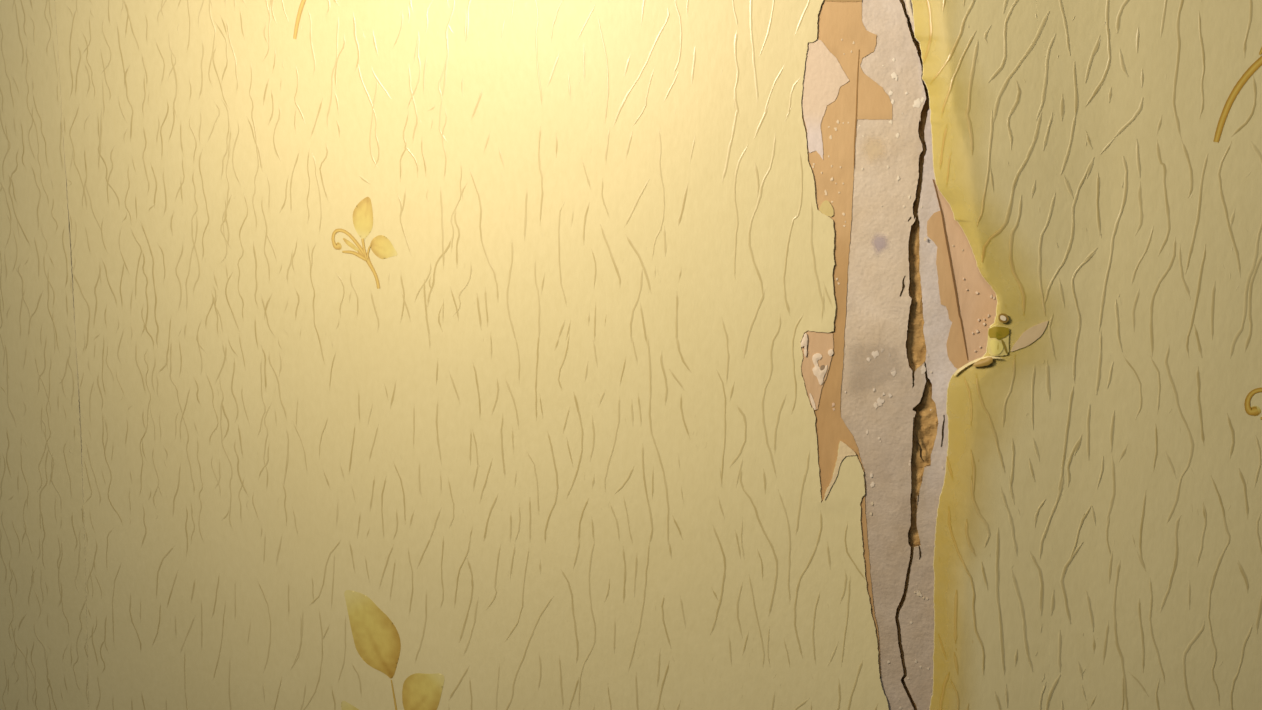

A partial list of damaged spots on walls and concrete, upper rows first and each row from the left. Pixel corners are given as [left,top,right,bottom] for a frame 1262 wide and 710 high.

flaking render [840,0,957,710]
crack [895,0,944,710]
damp [912,0,1013,326]
damp [930,354,995,710]